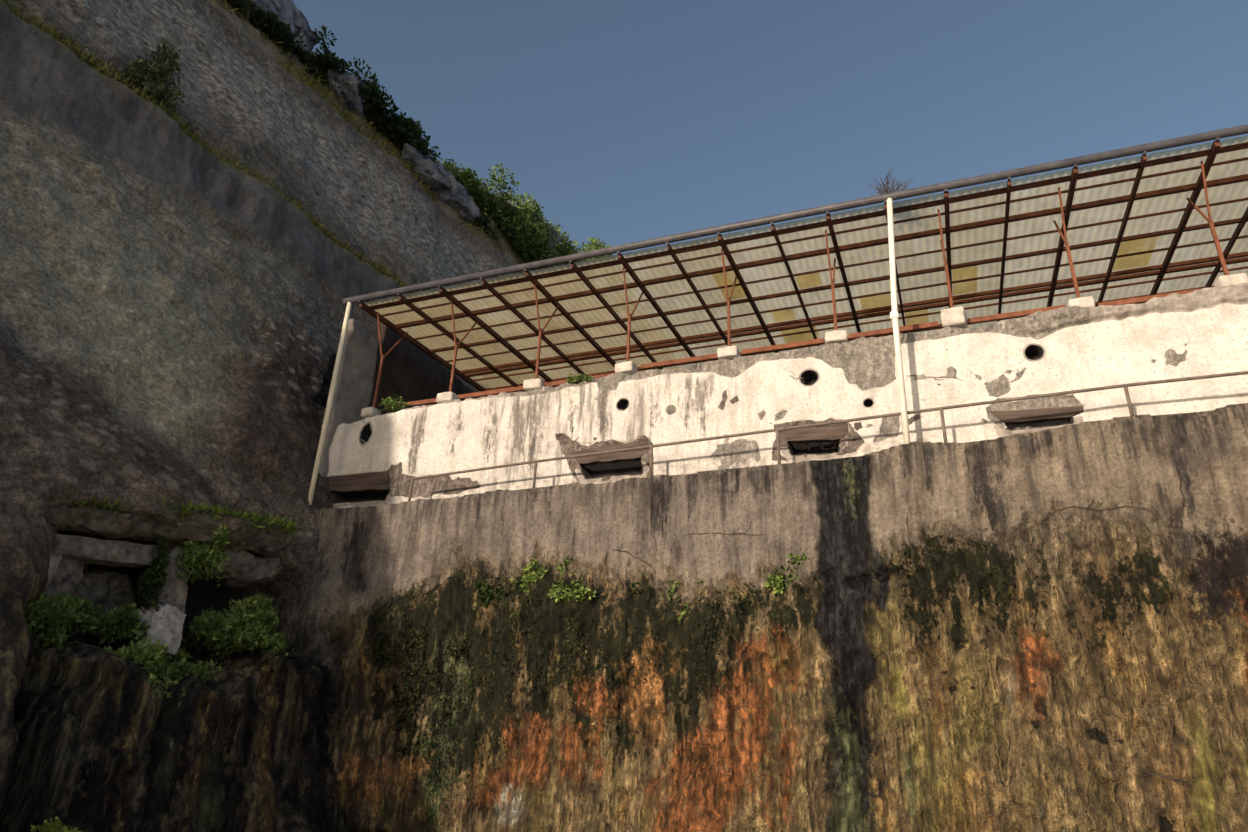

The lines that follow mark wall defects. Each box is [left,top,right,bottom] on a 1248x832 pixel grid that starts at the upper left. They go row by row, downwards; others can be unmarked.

spalling [510,305,1092,410]
spalling [1152,344,1187,366]
leakage [406,411,427,467]
leakage [486,392,550,471]
leakage [685,376,711,428]
spalling [711,410,921,470]
spalling [974,368,1084,430]
spalling [388,462,481,498]
leakage [687,404,1248,832]
corrosion [1015,629,1062,719]
corrosion [464,626,801,832]
leakage [657,659,731,779]